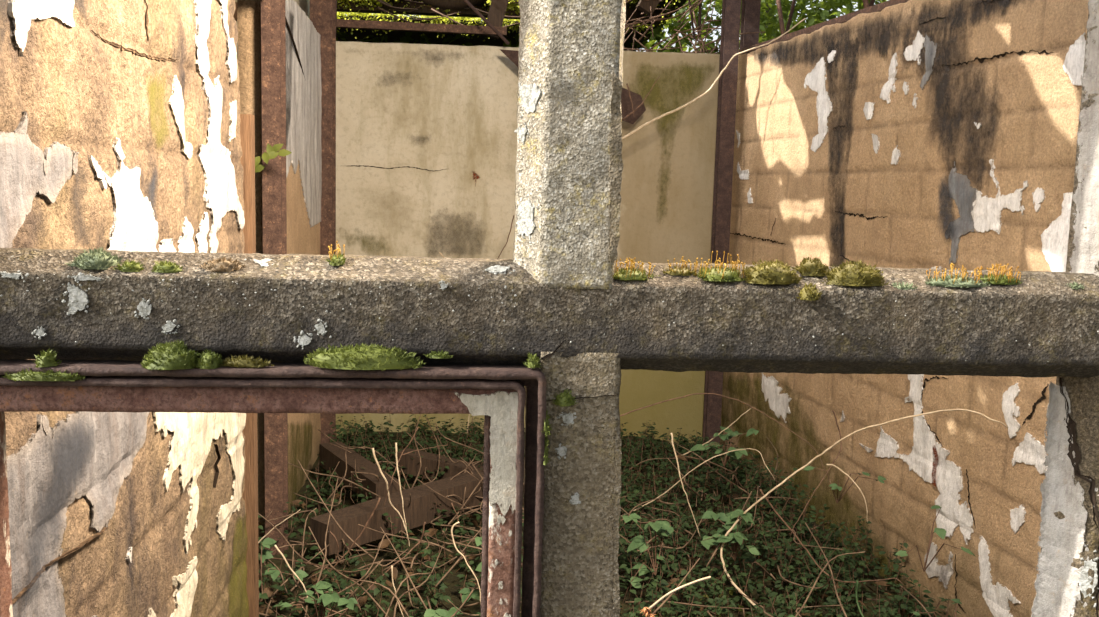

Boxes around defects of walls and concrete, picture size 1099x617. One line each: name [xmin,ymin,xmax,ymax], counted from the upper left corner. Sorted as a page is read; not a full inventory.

flaking render [0,0,245,253]
crack [91,0,177,61]
water stain [637,66,711,139]
flaking render [804,50,837,152]
flaking render [871,133,880,154]
water stain [758,0,1012,266]
flaking render [891,145,901,165]
flaking render [863,31,937,120]
flaking render [761,373,792,423]
flaking render [7,412,246,617]
peeling [859,374,1099,617]
crack [1022,378,1099,617]